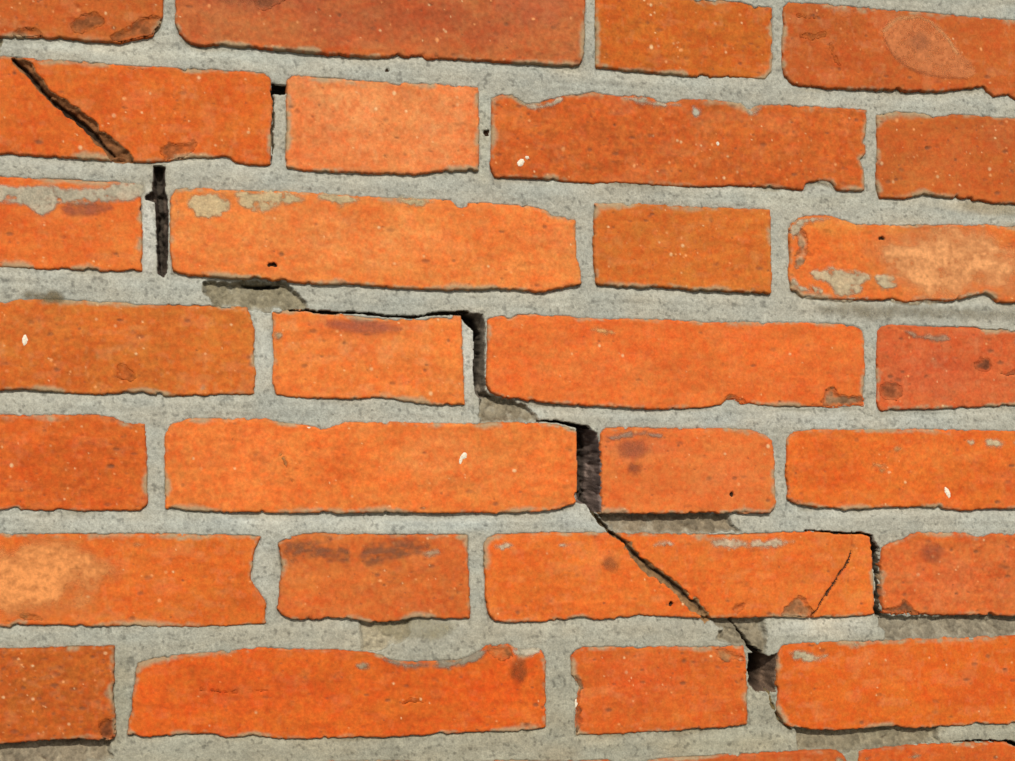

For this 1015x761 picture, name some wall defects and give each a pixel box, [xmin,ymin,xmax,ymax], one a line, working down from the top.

crack [268,91,276,165]
crack [12,58,169,278]
spalling [793,229,808,269]
peeling [202,280,307,313]
crack [241,284,278,292]
crack [288,309,491,398]
crack [537,420,792,730]
crack [804,530,881,615]
crack [963,738,1015,746]